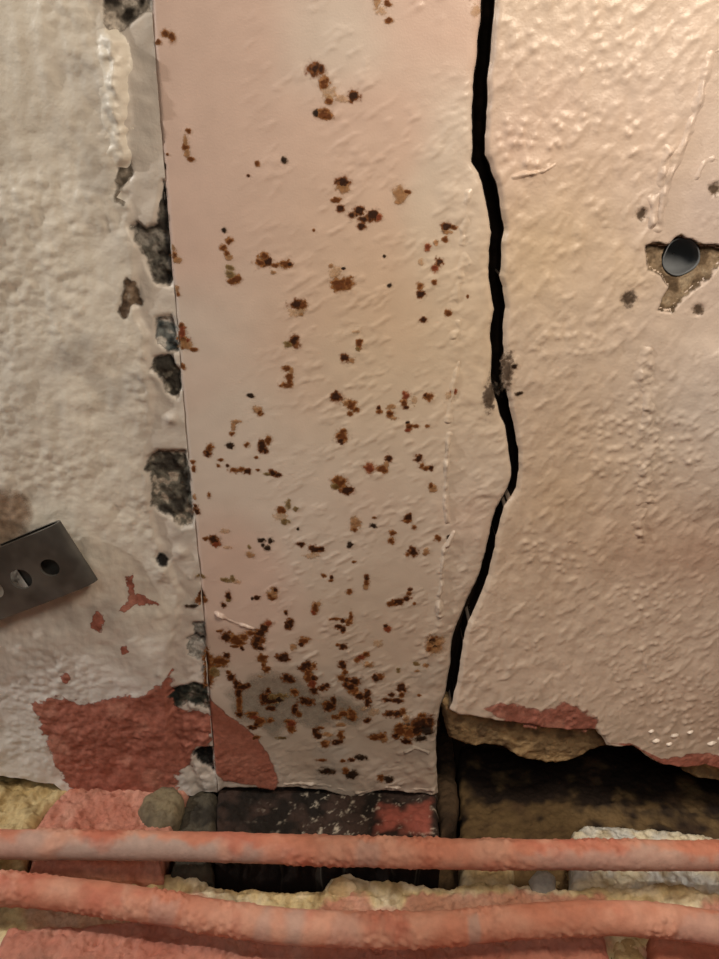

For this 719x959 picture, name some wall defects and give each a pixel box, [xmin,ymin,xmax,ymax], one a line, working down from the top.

flaking render [104,0,153,32]
corrosion [306,62,361,120]
flaking render [132,186,173,285]
corrosion [330,176,383,230]
corrosion [416,222,458,298]
peeling [637,49,719,313]
flaking render [152,316,181,395]
crack [436,0,523,743]
corrosion [190,419,282,477]
flaking render [144,450,194,525]
corrosion [202,610,435,779]
flaking render [441,691,606,763]